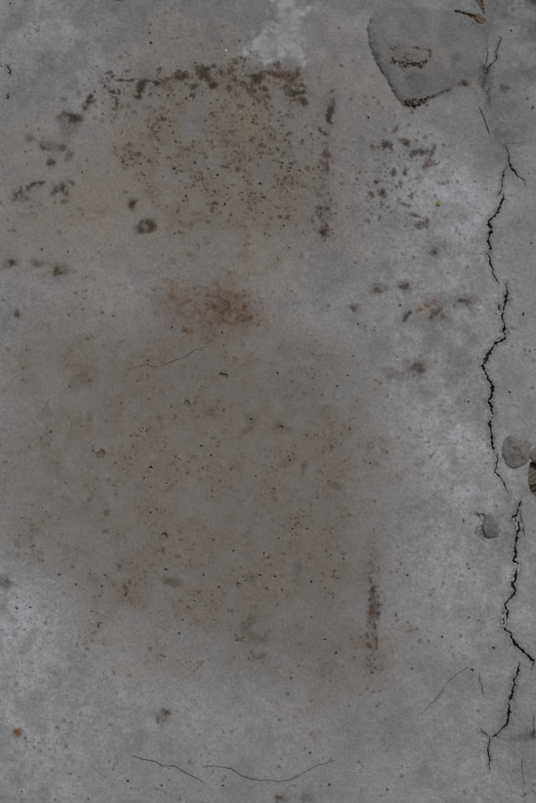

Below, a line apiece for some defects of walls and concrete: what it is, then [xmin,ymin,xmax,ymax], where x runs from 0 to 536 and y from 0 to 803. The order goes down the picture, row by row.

spalling [383,43,436,74]
crack [484,36,503,78]
crack [5,64,13,99]
corrosion [70,57,307,122]
spalling [401,95,433,111]
crack [477,98,536,771]
crack [420,666,485,716]